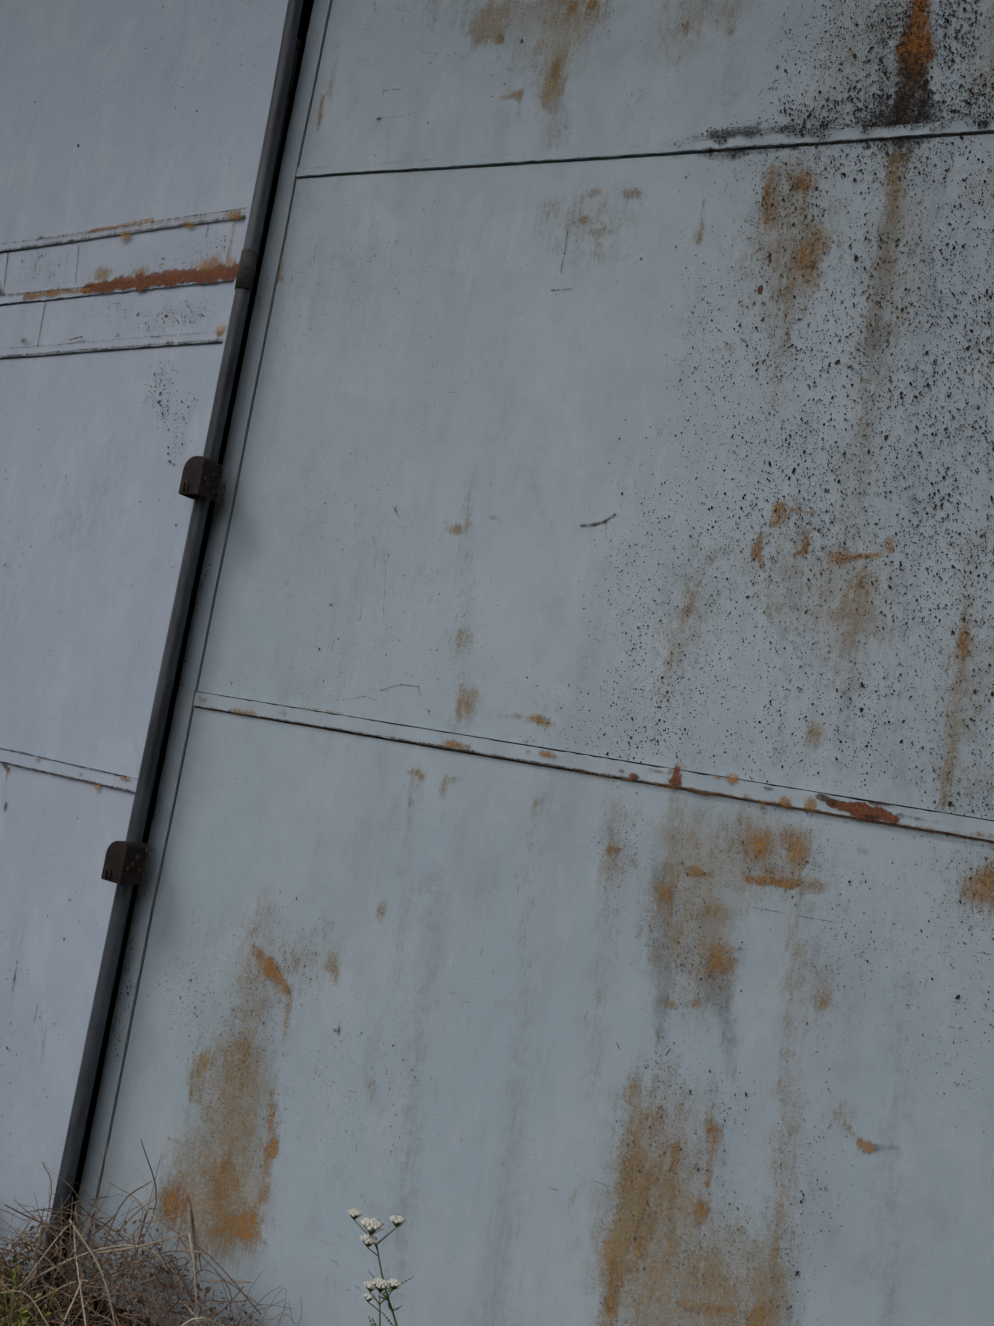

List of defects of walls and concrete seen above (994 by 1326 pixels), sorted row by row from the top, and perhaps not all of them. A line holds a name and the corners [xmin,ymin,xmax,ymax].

corrosion [0,254,239,300]
corrosion [763,164,811,229]
corrosion [873,0,935,231]
corrosion [196,706,994,976]
corrosion [247,945,289,1007]
corrosion [161,1033,278,1253]
corrosion [600,1114,781,1326]